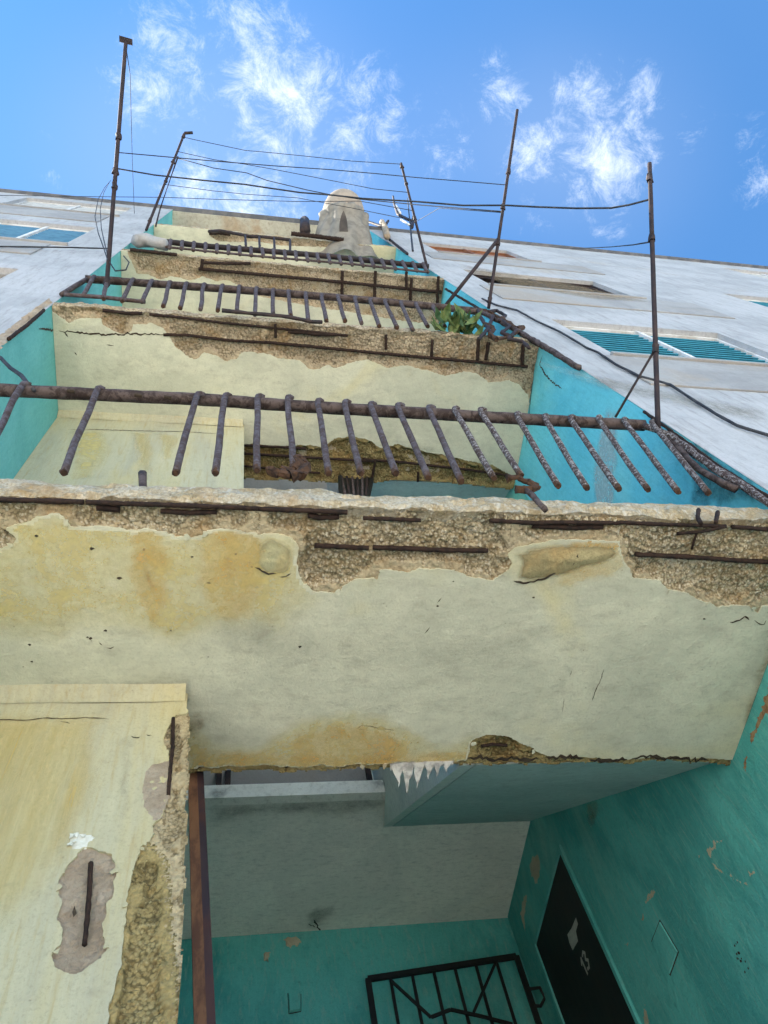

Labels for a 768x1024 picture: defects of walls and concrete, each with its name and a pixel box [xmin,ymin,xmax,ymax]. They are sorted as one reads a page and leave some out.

crack [39,328,163,355]
spalling [0,248,551,399]
spalling [0,497,768,620]
peeling [750,688,768,744]
spalling [52,713,731,1024]
peeling [698,840,755,885]